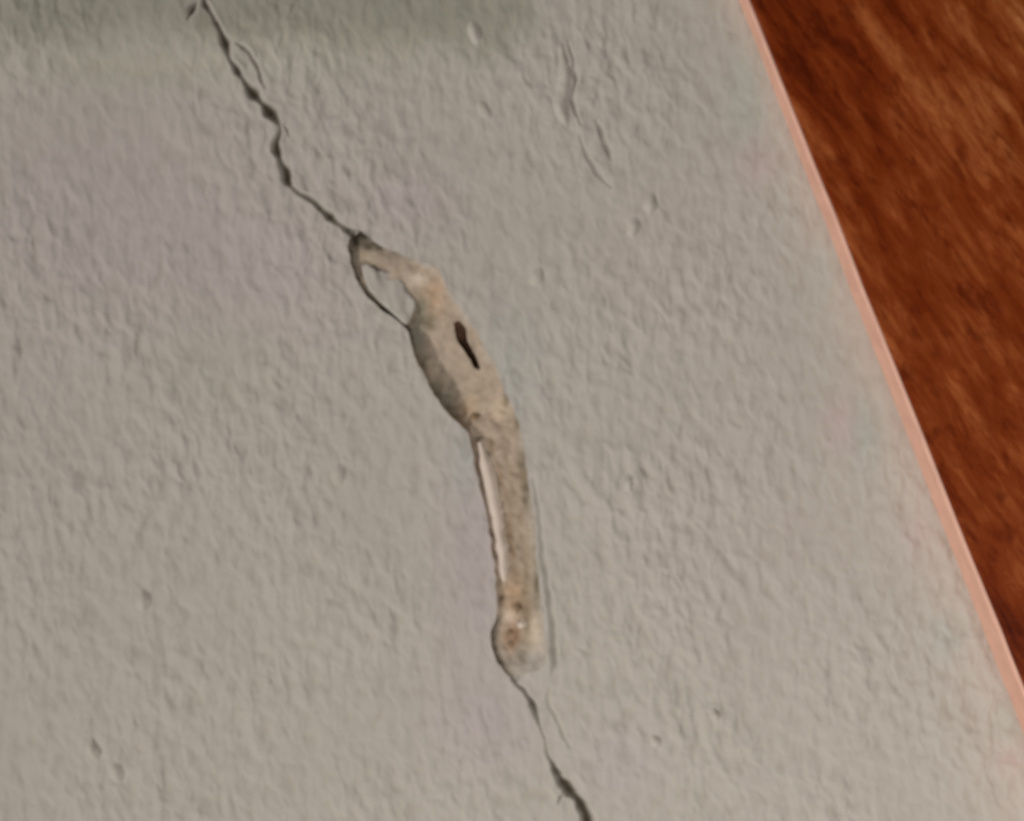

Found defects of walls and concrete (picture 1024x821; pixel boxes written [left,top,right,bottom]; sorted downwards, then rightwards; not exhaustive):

crack [185,0,358,239]
crack [552,39,614,189]
crack [510,675,596,821]